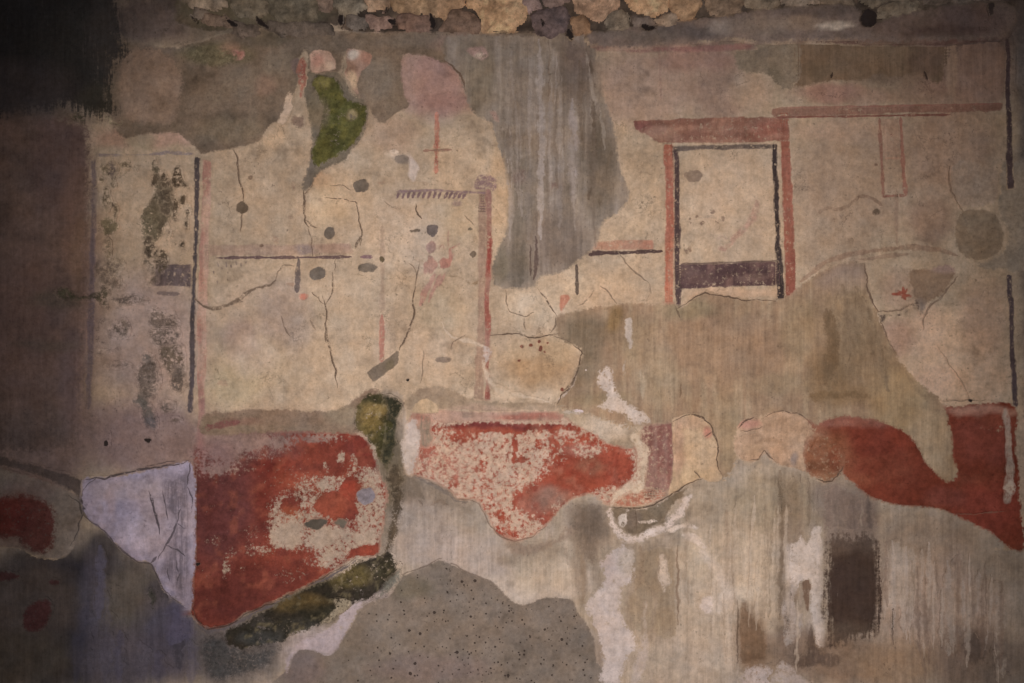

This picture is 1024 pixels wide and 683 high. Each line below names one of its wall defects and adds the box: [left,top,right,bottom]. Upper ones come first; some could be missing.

water stain [0,0,186,128]
crack [233,150,244,230]
flaking render [300,69,370,193]
water stain [500,39,616,286]
crack [194,182,363,388]
crack [399,263,425,383]
crack [451,286,617,404]
flaking render [0,513,337,683]
water stain [283,602,363,674]
flaking render [187,350,822,683]
water stain [441,317,1012,683]
flaking render [799,471,1024,683]